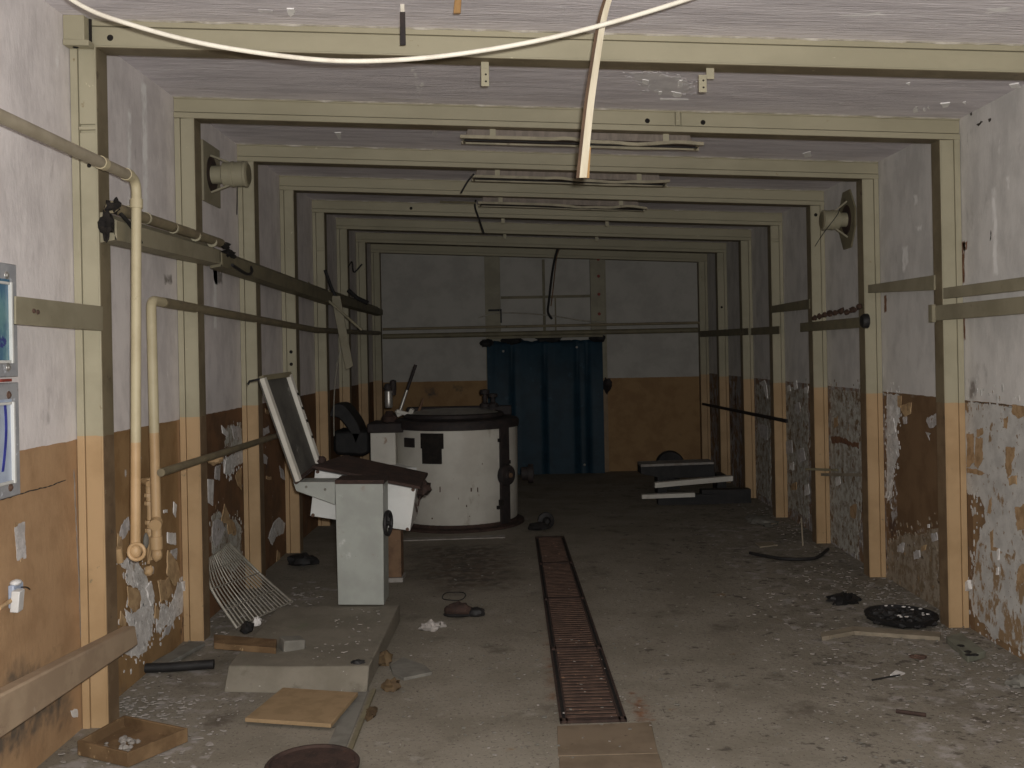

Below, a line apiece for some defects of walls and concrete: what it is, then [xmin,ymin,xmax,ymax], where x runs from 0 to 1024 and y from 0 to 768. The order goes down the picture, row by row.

peeling [14,522,26,562]
crack [1,472,81,637]
peeling [117,517,185,674]
peeling [207,421,243,580]
peeling [828,379,863,560]
flaking render [883,382,940,617]
peeling [965,380,1024,656]